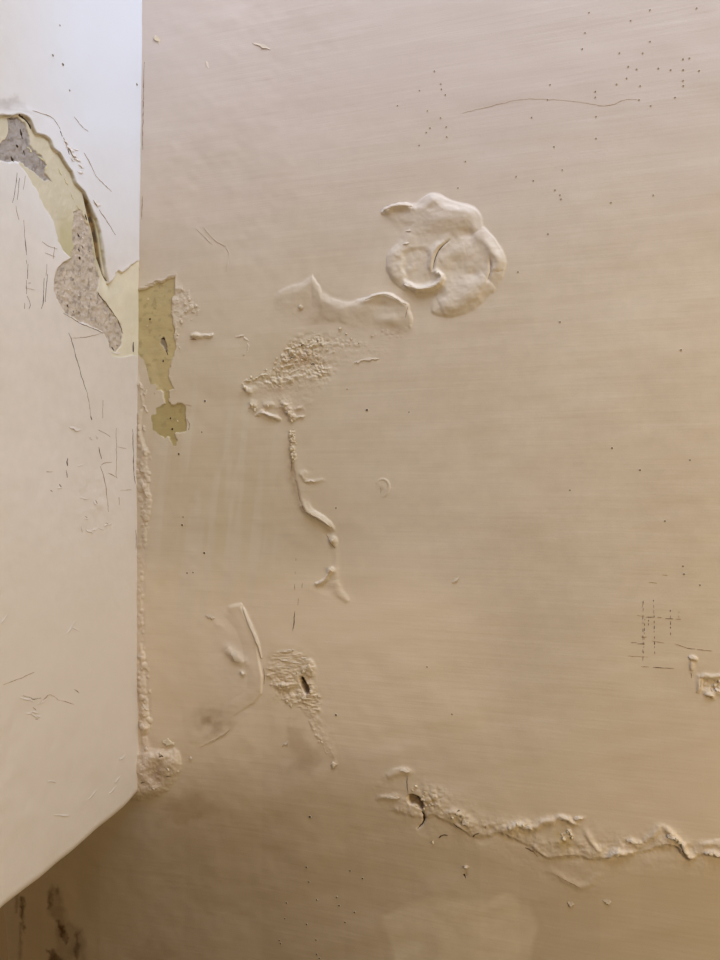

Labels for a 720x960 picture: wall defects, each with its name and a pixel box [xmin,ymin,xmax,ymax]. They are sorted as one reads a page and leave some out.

peeling [0,103,220,457]
spalling [238,325,397,423]
spalling [126,723,192,809]
spalling [264,642,344,772]